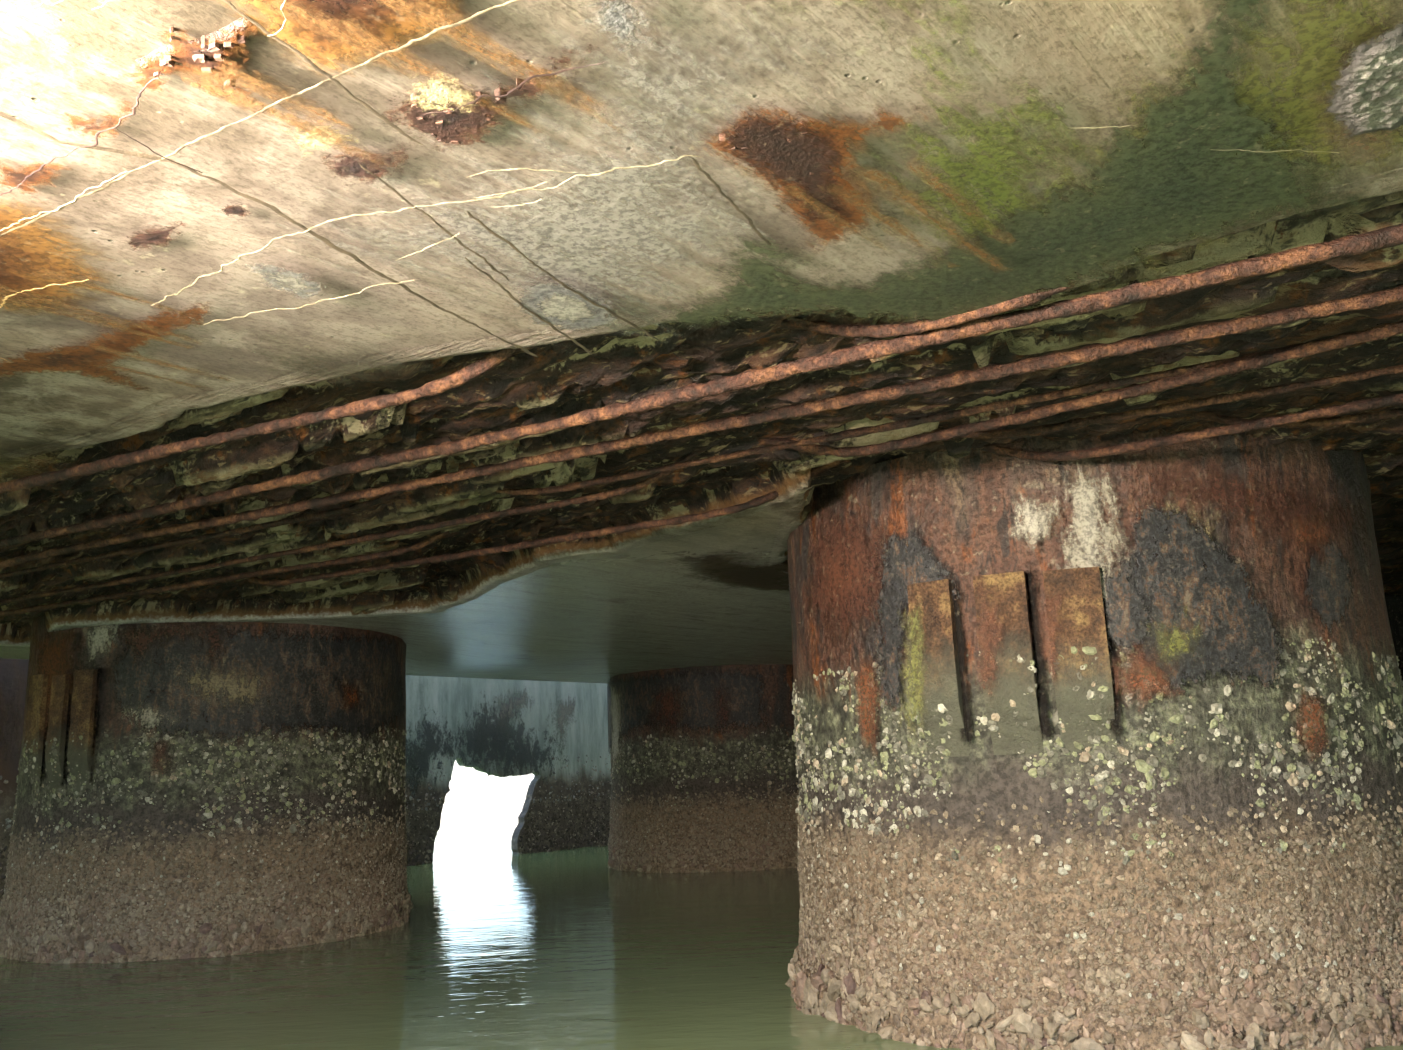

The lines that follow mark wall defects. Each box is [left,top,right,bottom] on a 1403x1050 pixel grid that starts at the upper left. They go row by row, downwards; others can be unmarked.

crack [0,279,89,308]
rust [66,101,132,138]
crack [0,78,202,231]
rust [0,162,230,391]
crack [268,0,287,36]
peeling [284,120,358,154]
rust [124,0,610,186]
crack [151,155,702,325]
rust [707,108,1015,272]
spalling [0,167,1403,756]
efflorescence [1053,471,1130,598]
water stain [405,689,575,798]